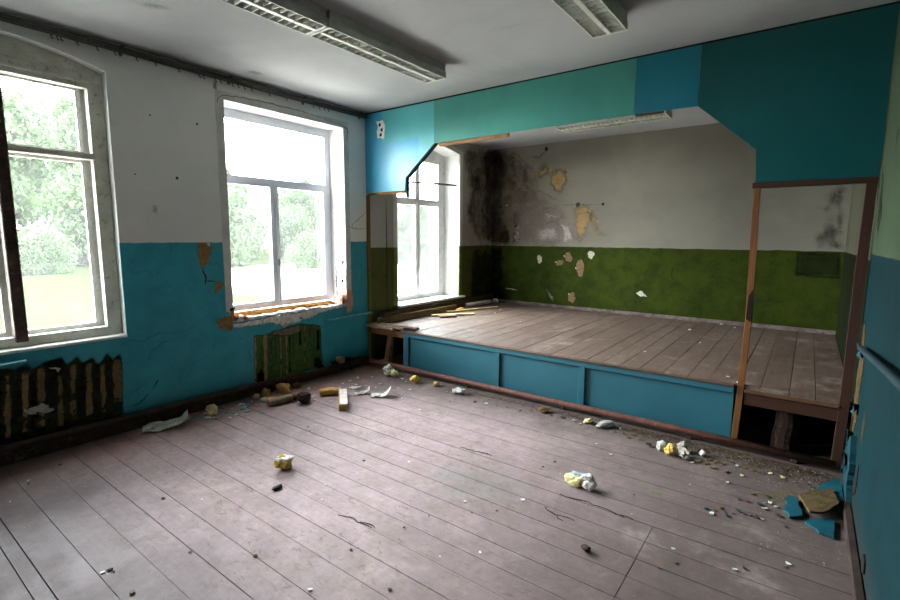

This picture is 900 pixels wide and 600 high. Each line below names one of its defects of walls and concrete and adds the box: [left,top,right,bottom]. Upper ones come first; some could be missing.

damp [467,152,571,298]
peeling [195,242,214,270]
spalling [555,251,594,277]
spalling [214,307,264,332]
flaking render [23,403,54,414]